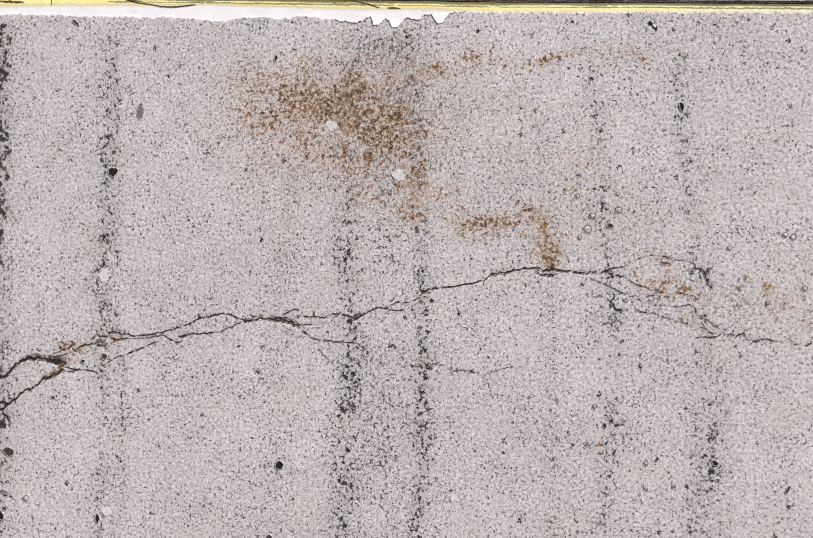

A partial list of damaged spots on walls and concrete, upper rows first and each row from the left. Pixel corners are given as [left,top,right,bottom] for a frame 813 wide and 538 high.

rust [207,42,615,274]
crack [0,250,812,422]